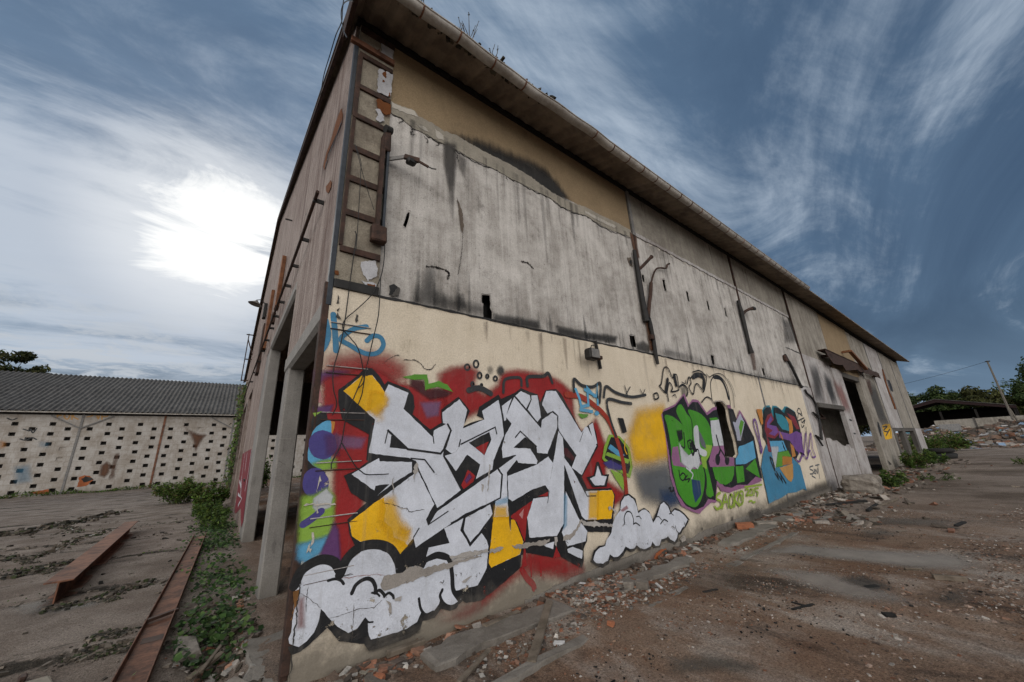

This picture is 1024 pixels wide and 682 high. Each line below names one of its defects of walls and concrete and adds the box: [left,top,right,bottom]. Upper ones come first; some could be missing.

spalling [375,69,631,238]
damp [444,136,567,200]
crack [392,114,628,238]
peeling [360,260,378,287]
damp [494,314,539,328]
damp [558,327,616,342]
damp [814,372,835,401]